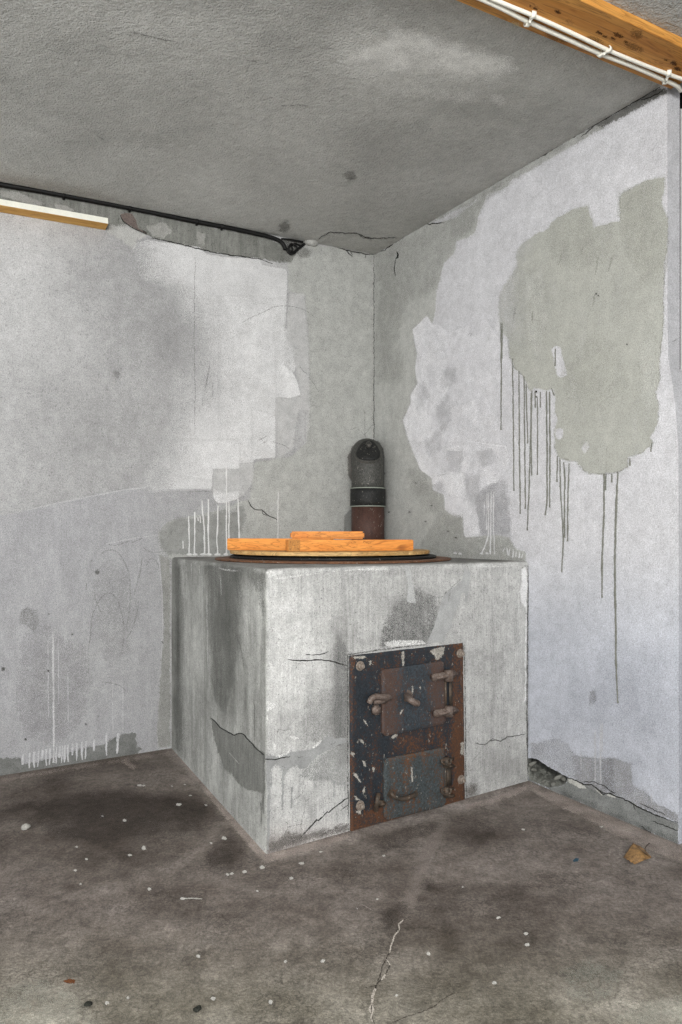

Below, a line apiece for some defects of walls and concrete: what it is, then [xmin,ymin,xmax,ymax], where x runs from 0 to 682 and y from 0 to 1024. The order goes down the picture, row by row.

crack [539,87,662,158]
flaking render [0,180,526,561]
crack [319,232,399,440]
leakage [474,177,669,703]
crack [211,700,301,768]
crack [284,644,424,837]
crack [463,566,529,794]
spalling [528,758,581,788]
crack [567,777,678,833]
crack [341,895,456,1024]